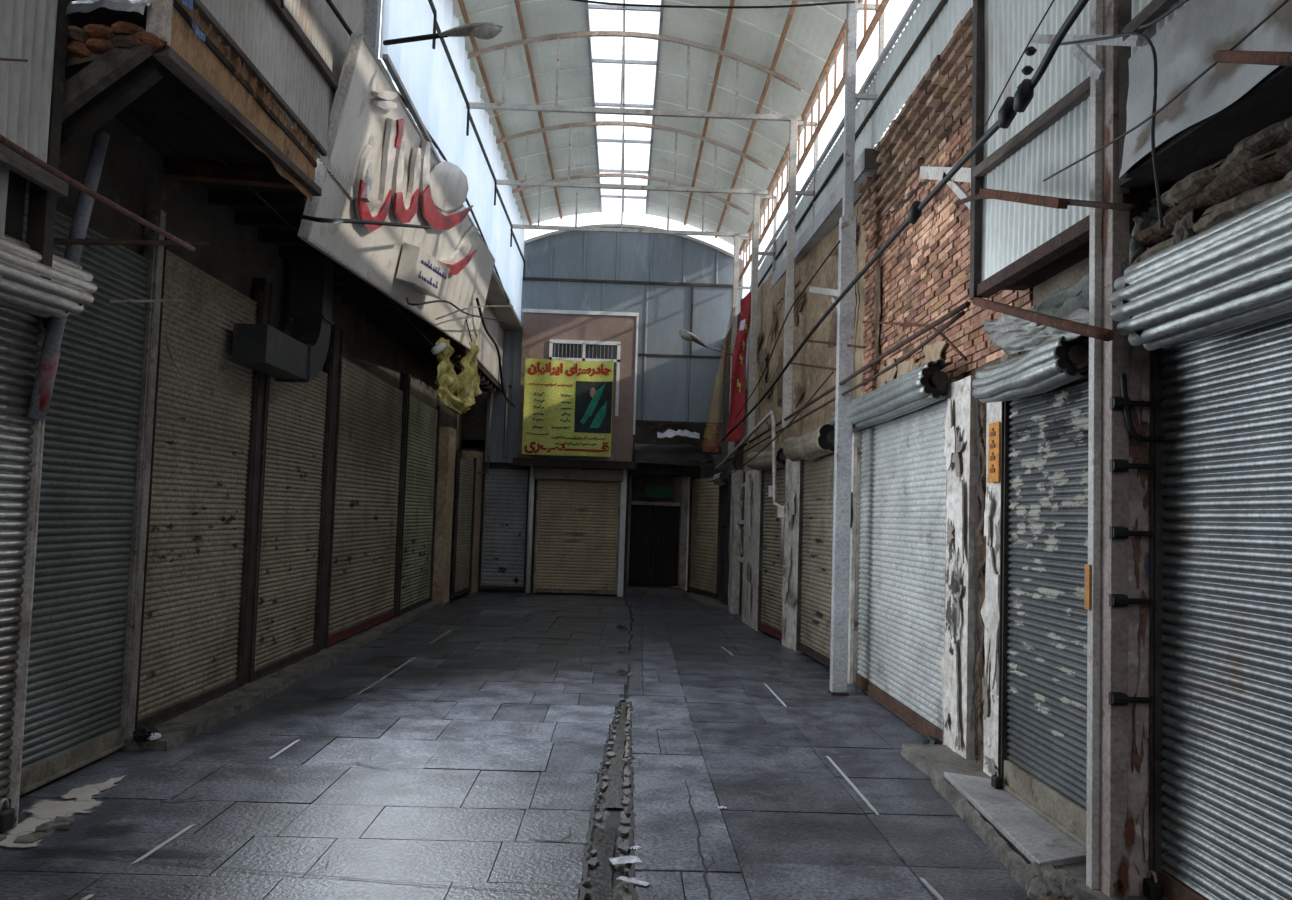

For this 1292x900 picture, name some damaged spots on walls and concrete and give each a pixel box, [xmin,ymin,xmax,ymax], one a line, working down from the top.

flaking render [874,259,947,389]
flaking render [940,398,964,751]
crack [90,598,637,900]
crack [685,780,715,900]
corrosion [1114,813,1135,898]